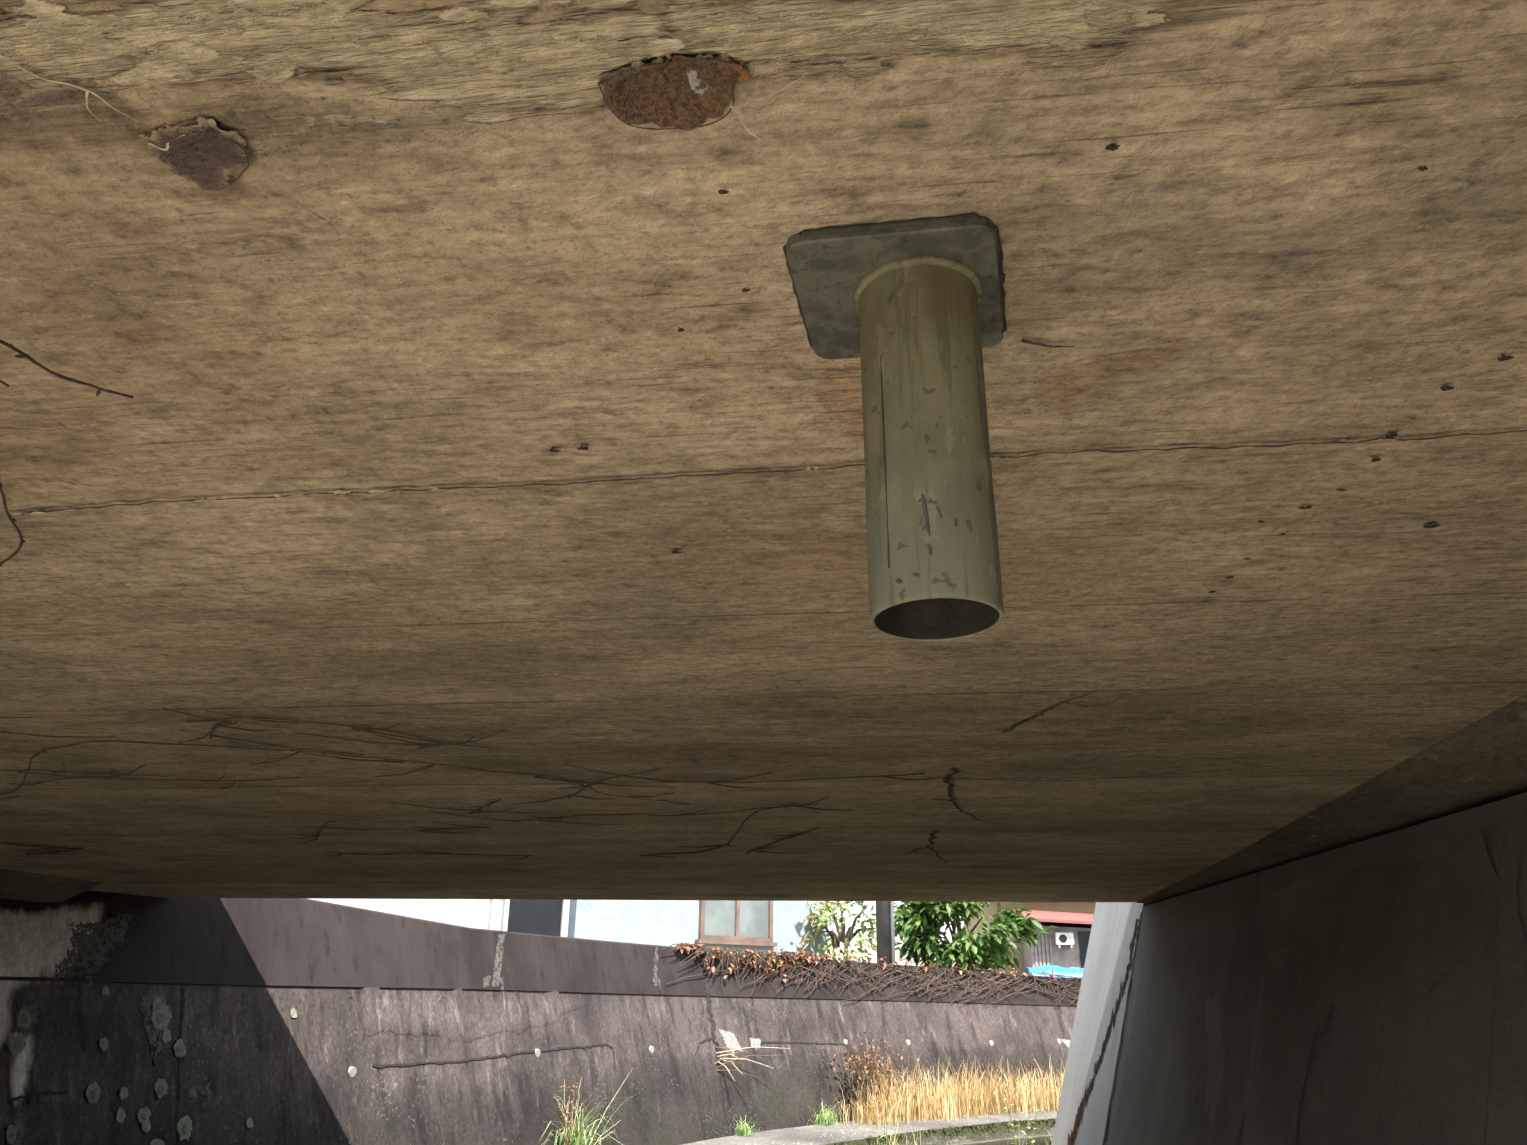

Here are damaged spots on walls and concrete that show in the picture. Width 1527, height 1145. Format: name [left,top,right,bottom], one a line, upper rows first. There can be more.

peeling [0,0,1188,141]
spalling [140,117,251,192]
damp [0,71,462,160]
crack [1002,690,1121,733]
crack [855,759,1364,862]
damp [0,897,139,1145]
damp [137,985,173,1066]